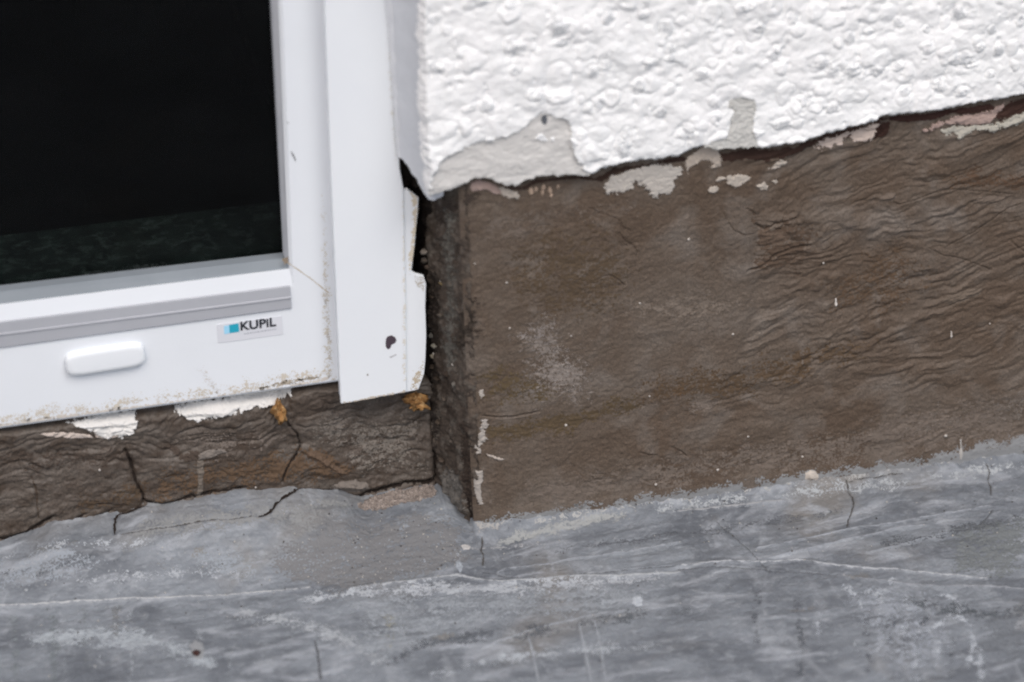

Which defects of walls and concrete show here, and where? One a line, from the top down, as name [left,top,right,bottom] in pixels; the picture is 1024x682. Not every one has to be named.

spalling [429,112,590,200]
peeling [603,145,787,199]
peeling [813,123,879,151]
peeling [922,103,1024,139]
crack [124,448,245,503]
crack [282,421,301,481]
crack [0,476,110,540]